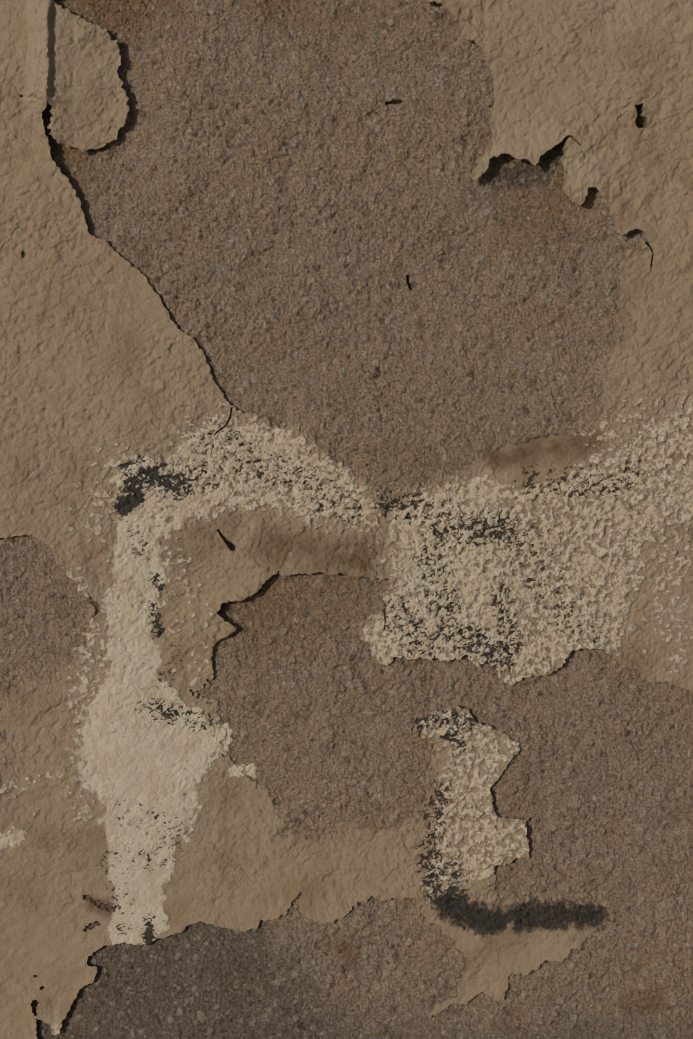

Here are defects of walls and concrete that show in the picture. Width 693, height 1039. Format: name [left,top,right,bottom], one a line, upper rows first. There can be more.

peeling [37,0,646,499]
peeling [0,535,101,718]
peeling [30,571,693,1039]